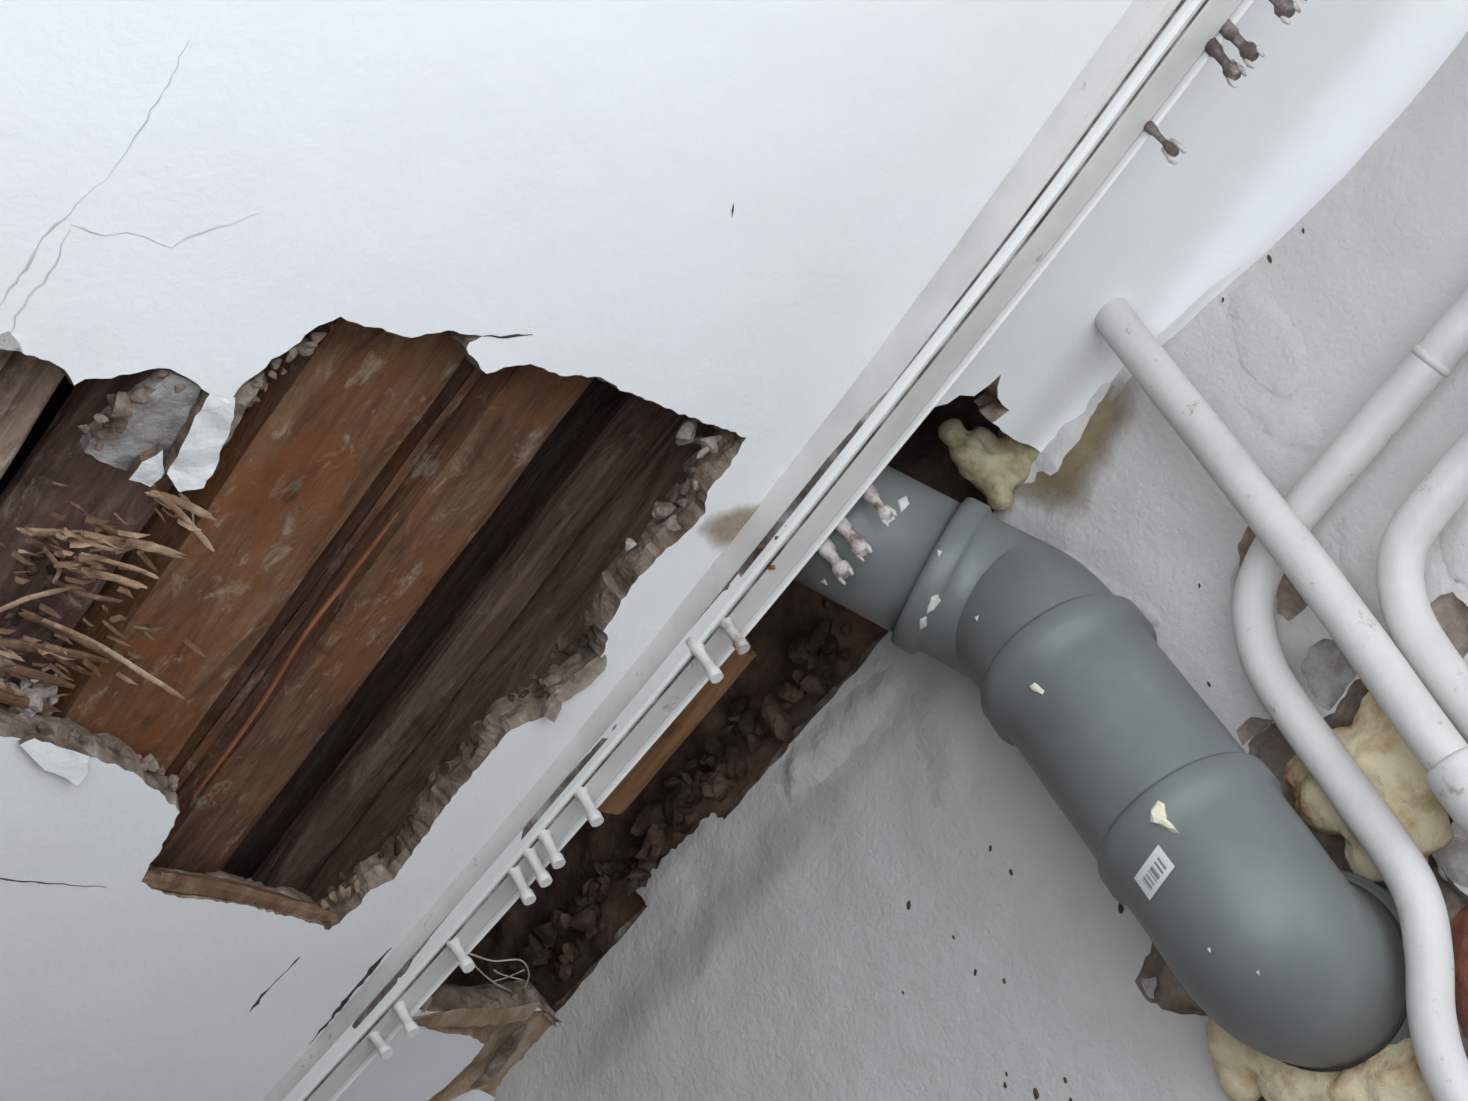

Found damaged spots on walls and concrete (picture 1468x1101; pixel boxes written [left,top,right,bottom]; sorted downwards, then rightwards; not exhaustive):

crack [0,40,260,353]
flaking render [0,331,21,351]
flaking render [223,370,264,447]
spalling [1276,574,1307,621]
peeling [1430,499,1468,659]
flaking render [542,654,607,723]
spalling [1301,638,1369,729]
flaking render [19,734,89,786]
spalling [1236,717,1353,873]
crack [0,878,104,887]
spalling [1428,814,1468,1059]
spalling [1135,942,1208,1016]